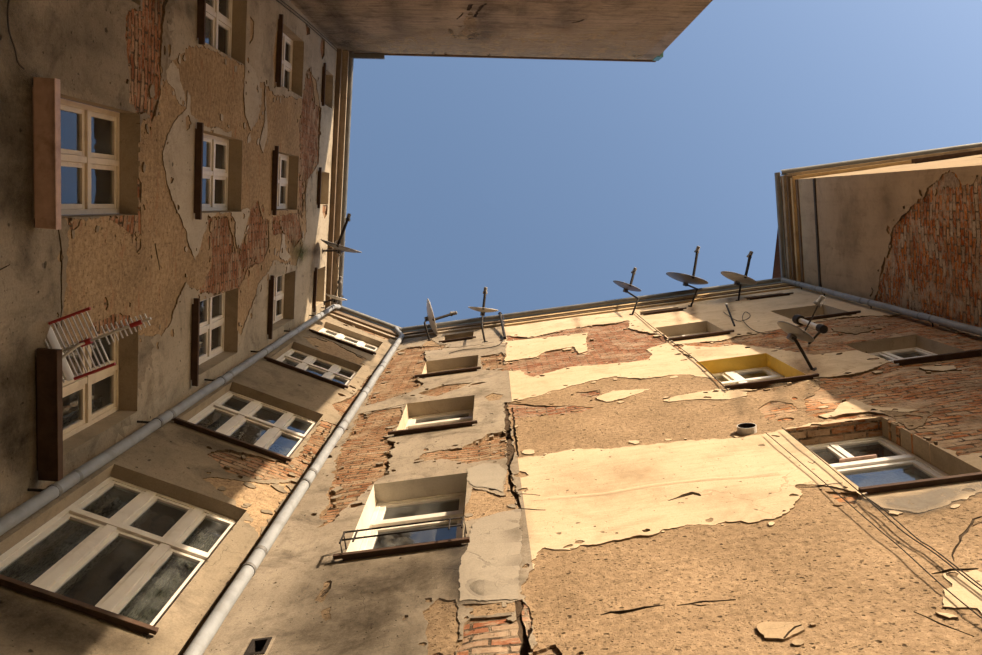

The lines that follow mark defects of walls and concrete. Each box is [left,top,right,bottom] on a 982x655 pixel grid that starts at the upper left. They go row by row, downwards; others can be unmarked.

peeling [52,0,321,349]
spalling [202,336,485,537]
crack [503,402,539,511]
spalling [413,170,982,521]
crack [515,600,531,655]
peeling [418,484,982,655]